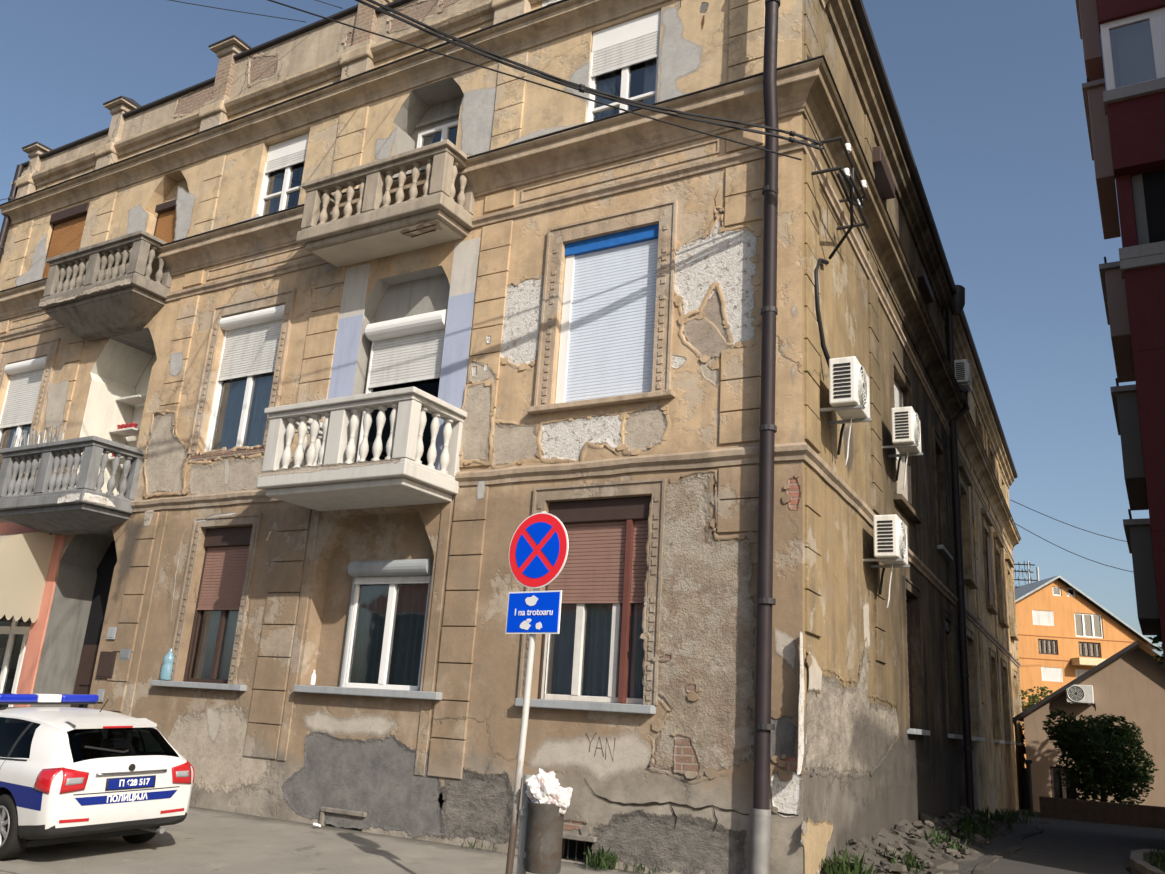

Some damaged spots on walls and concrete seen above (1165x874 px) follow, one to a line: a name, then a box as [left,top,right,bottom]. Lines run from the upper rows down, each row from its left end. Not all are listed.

flaking render [459,275,671,499]
flaking render [671,206,763,386]
spalling [640,469,758,785]
flaking render [167,704,272,794]
crack [584,779,798,831]
flaking render [770,629,900,874]